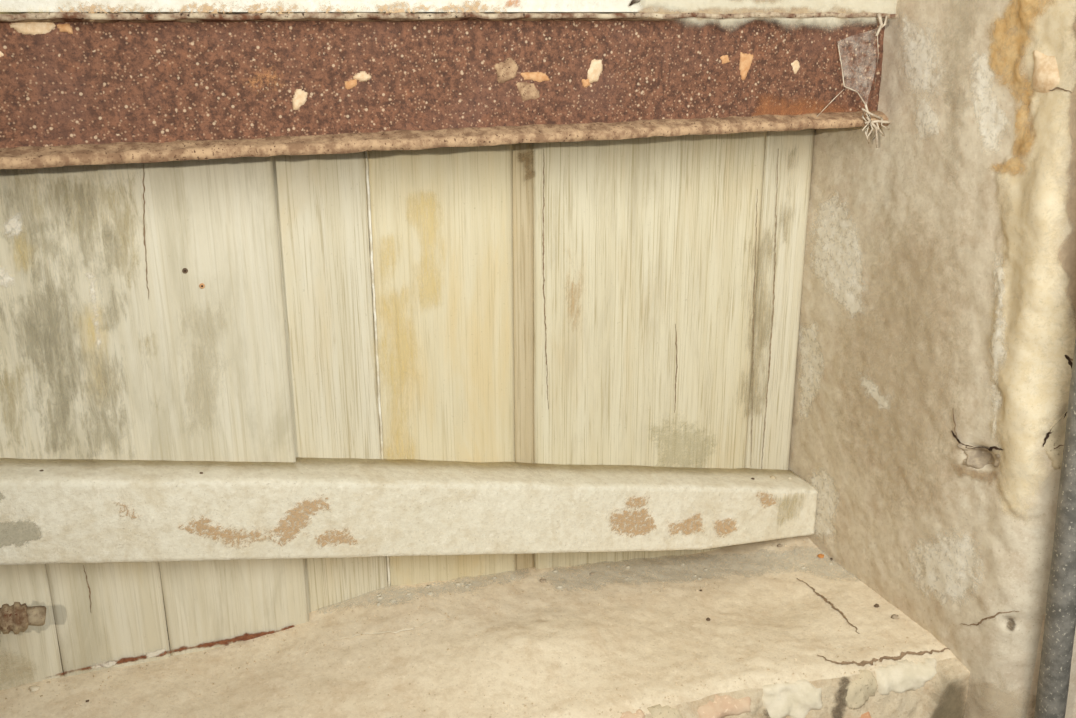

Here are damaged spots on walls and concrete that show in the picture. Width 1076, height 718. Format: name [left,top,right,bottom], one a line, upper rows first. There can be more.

water stain [971,0,1049,175]
mould [17,217,123,451]
peeling [0,520,41,548]
crack [797,578,860,634]
crack [961,611,1019,631]
crack [818,648,950,666]